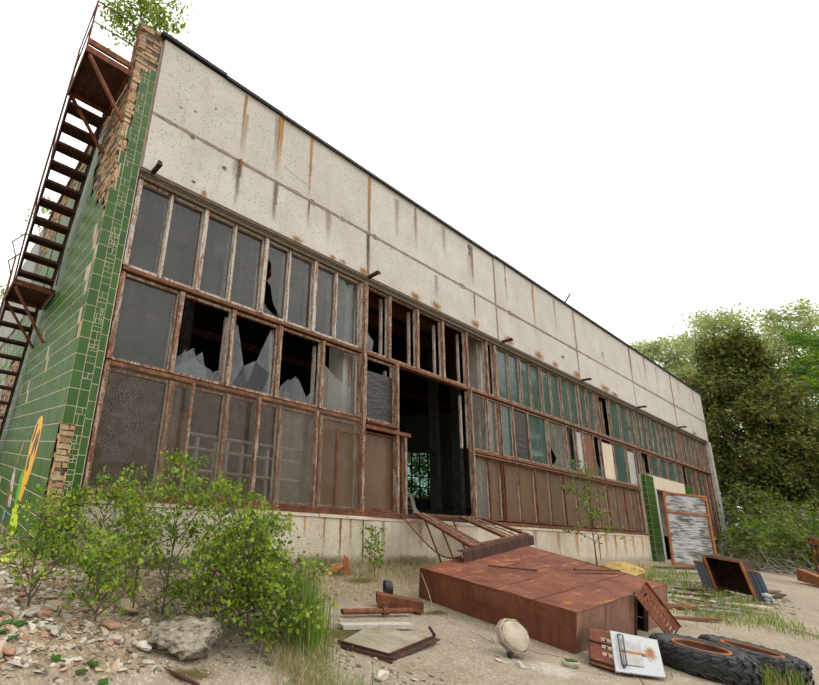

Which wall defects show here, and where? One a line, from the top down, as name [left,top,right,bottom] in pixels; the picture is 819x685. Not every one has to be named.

spalling [87,23,162,263]
spalling [36,163,86,274]
spalling [44,423,75,517]